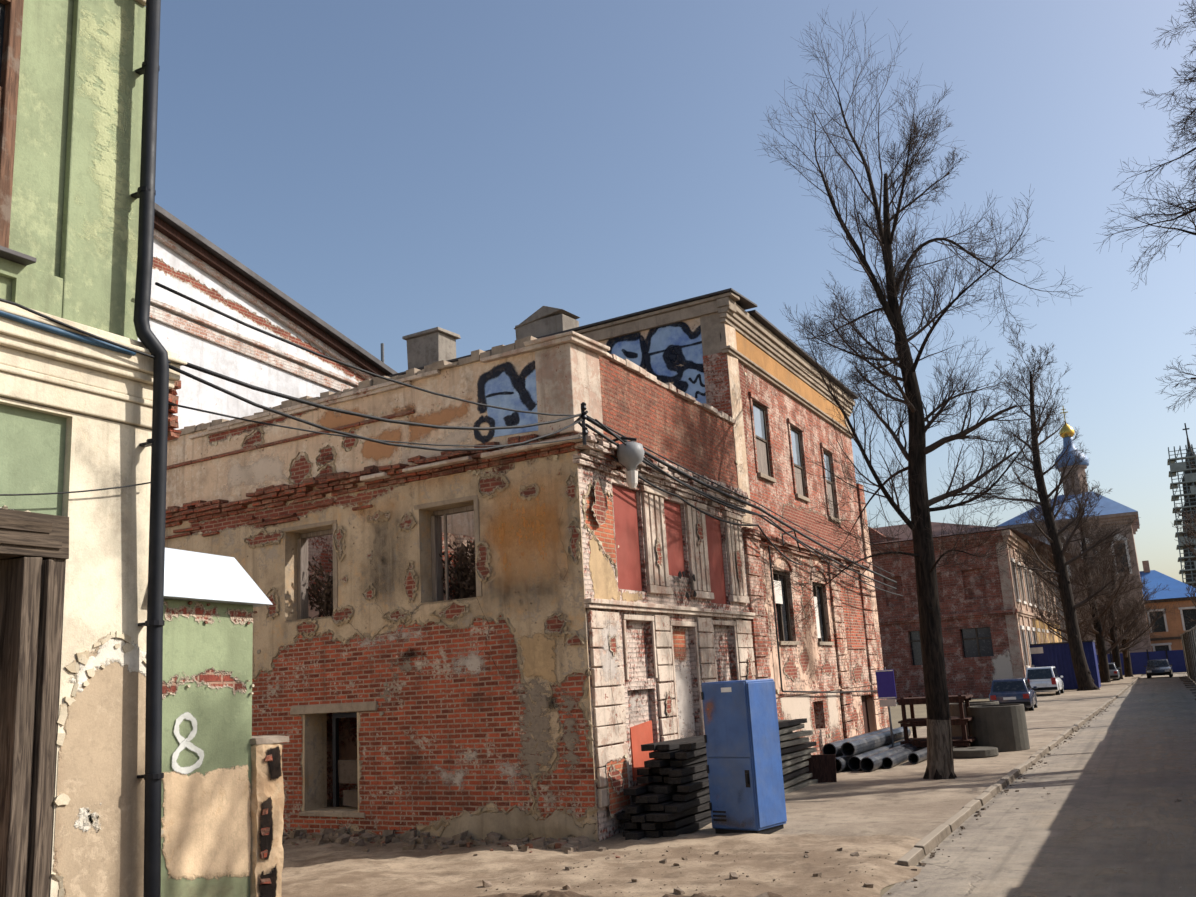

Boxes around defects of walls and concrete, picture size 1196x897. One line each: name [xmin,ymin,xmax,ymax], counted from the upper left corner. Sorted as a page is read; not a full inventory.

spalling [51,631,146,897]
flaking render [165,484,404,548]
flaking render [162,560,631,897]
flaking render [672,627,687,662]